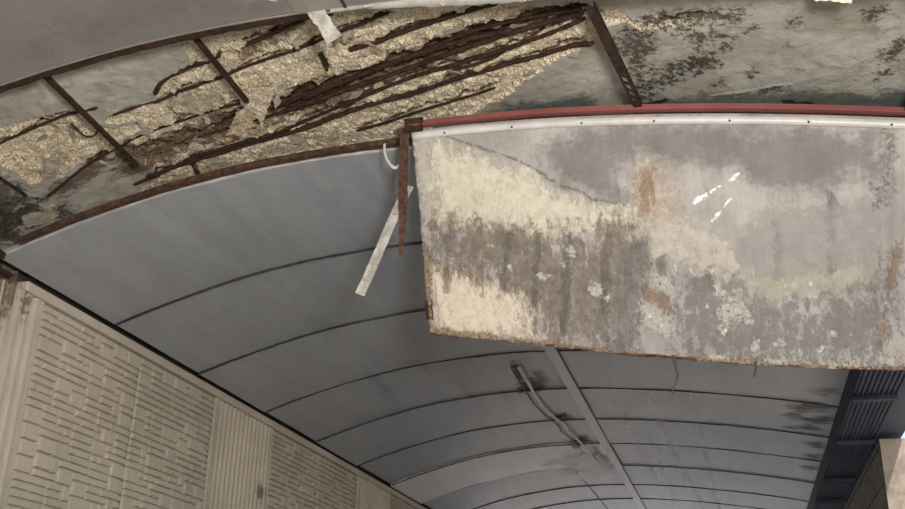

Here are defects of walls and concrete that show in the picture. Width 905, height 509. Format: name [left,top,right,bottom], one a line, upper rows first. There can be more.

corrosion [238,2,603,136]
mould [0,169,75,246]
corrosion [48,107,244,198]
spalling [0,0,721,243]
water stain [419,4,905,352]
peeling [587,281,609,303]
water stain [513,365,548,393]